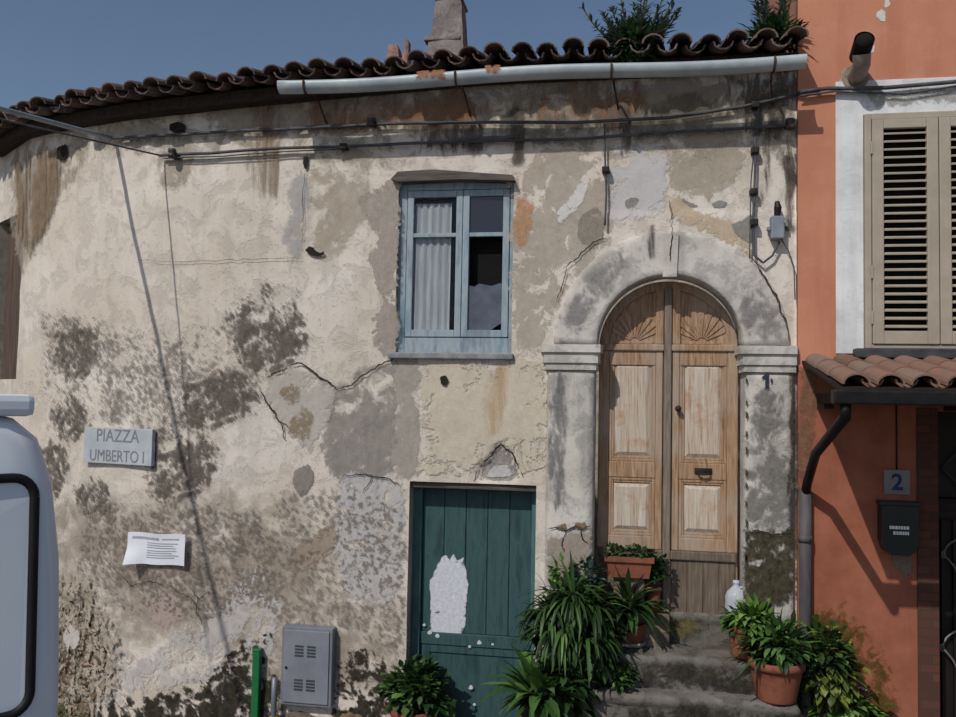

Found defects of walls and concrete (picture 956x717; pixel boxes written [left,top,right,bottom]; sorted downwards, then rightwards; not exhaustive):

peeling [875,0,890,21]
water stain [14,148,60,253]
peeling [10,117,194,271]
peeling [204,77,753,357]
crack [557,238,606,298]
crack [749,254,790,341]
crack [260,358,395,440]
water stain [40,282,407,717]
peeling [286,471,407,615]
water stain [743,367,817,609]